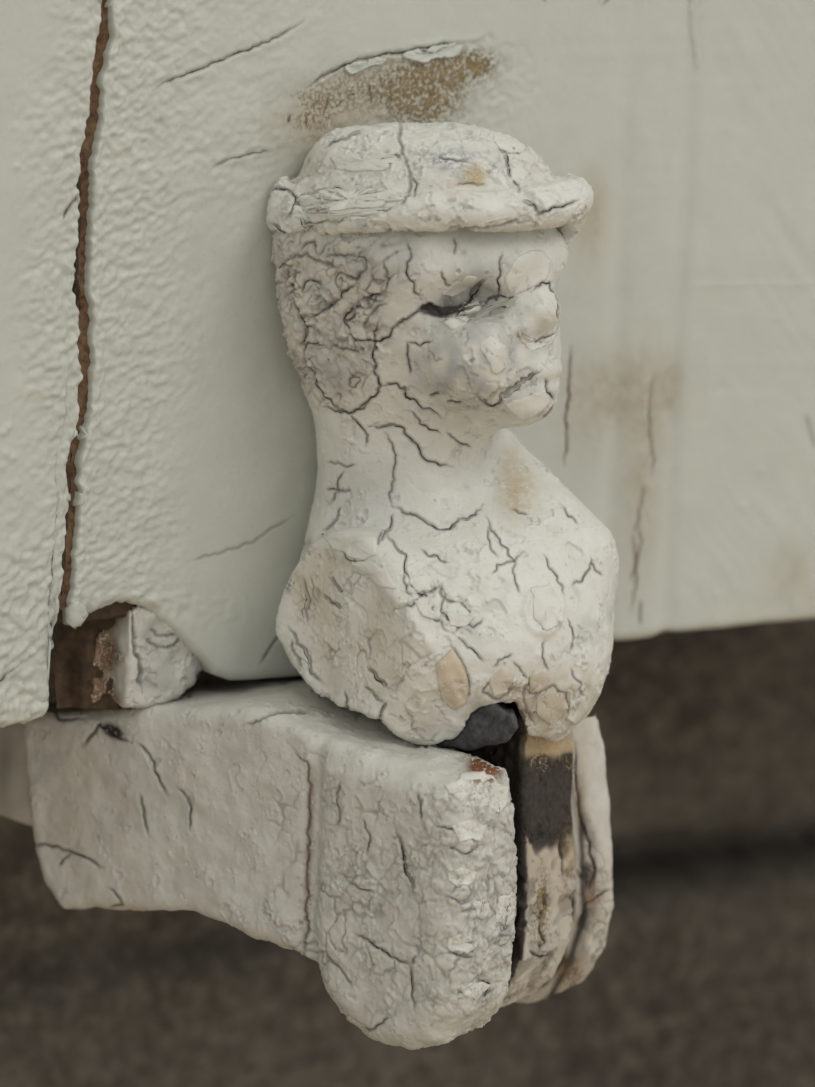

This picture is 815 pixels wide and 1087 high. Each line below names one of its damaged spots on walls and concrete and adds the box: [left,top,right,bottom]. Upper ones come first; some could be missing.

crack [154,21,303,90]
peeling [344,56,387,75]
peeling [401,43,463,63]
crack [271,187,372,233]
crack [506,153,577,213]
crack [58,0,113,607]
crack [291,248,598,720]
spalling [54,601,132,710]
spalling [103,724,122,738]
crack [295,753,370,952]
crack [397,836,413,894]
crack [362,937,416,1009]